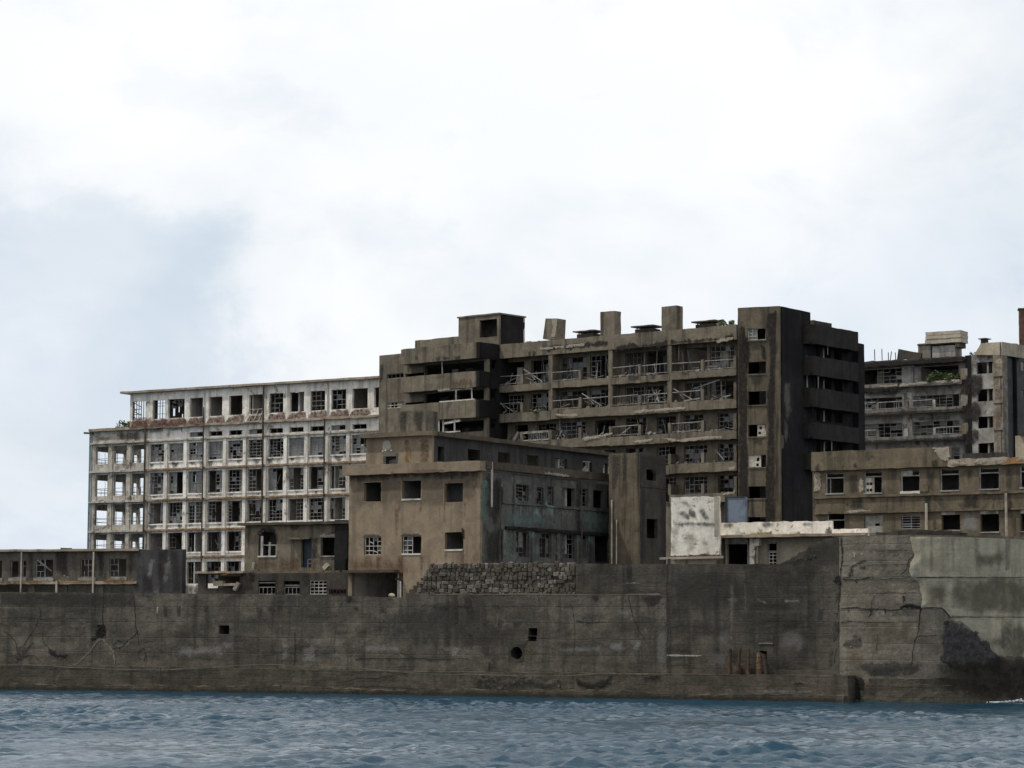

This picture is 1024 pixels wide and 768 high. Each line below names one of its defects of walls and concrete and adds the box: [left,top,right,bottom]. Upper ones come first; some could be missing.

crack [0,593,162,684]
crack [833,537,951,675]
damp [944,619,1024,699]